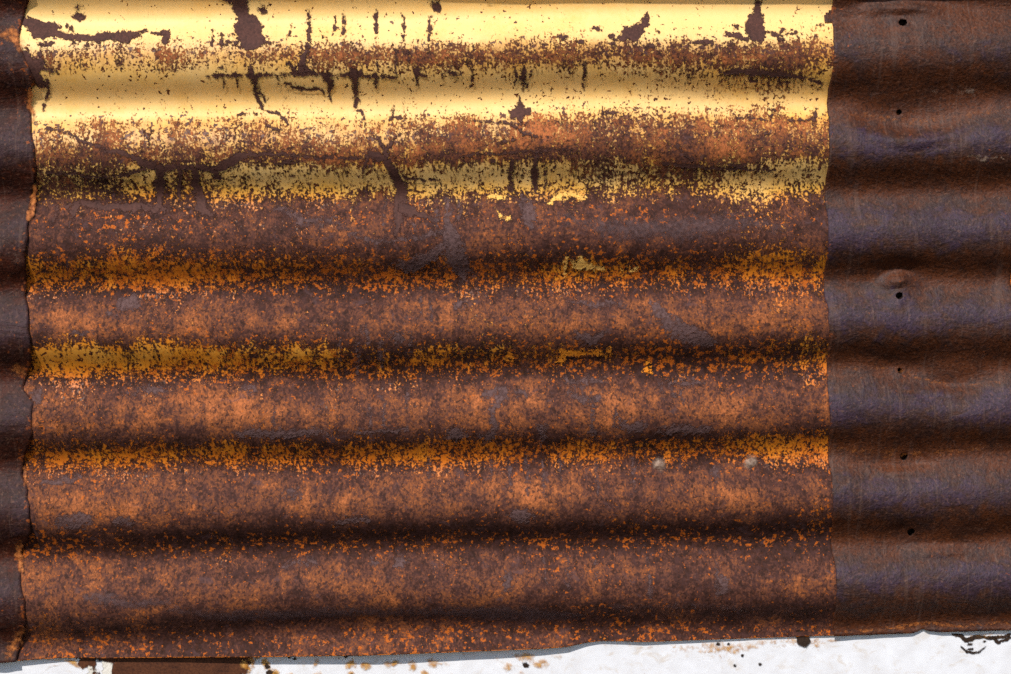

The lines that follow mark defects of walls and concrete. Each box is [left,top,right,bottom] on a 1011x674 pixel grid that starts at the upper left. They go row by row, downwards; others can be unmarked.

peeling [22,4,171,111]
peeling [209,0,292,51]
peeling [393,14,428,86]
peeling [426,1,441,41]
peeling [556,13,660,50]
peeling [725,0,798,44]
peeling [237,110,289,131]
peeling [508,65,533,122]
peeling [787,108,818,126]
peeling [356,109,474,284]
peeling [487,153,588,229]
rust [0,26,837,674]